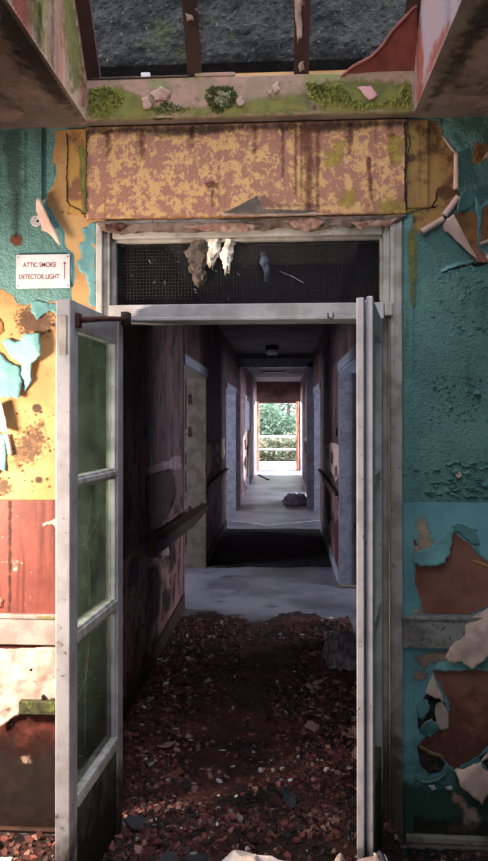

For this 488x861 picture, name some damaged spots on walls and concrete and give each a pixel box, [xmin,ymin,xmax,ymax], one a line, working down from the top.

peeling [45,130,96,311]
crack [403,122,438,213]
peeling [406,118,488,263]
peeling [0,289,56,500]
peeling [413,517,488,830]